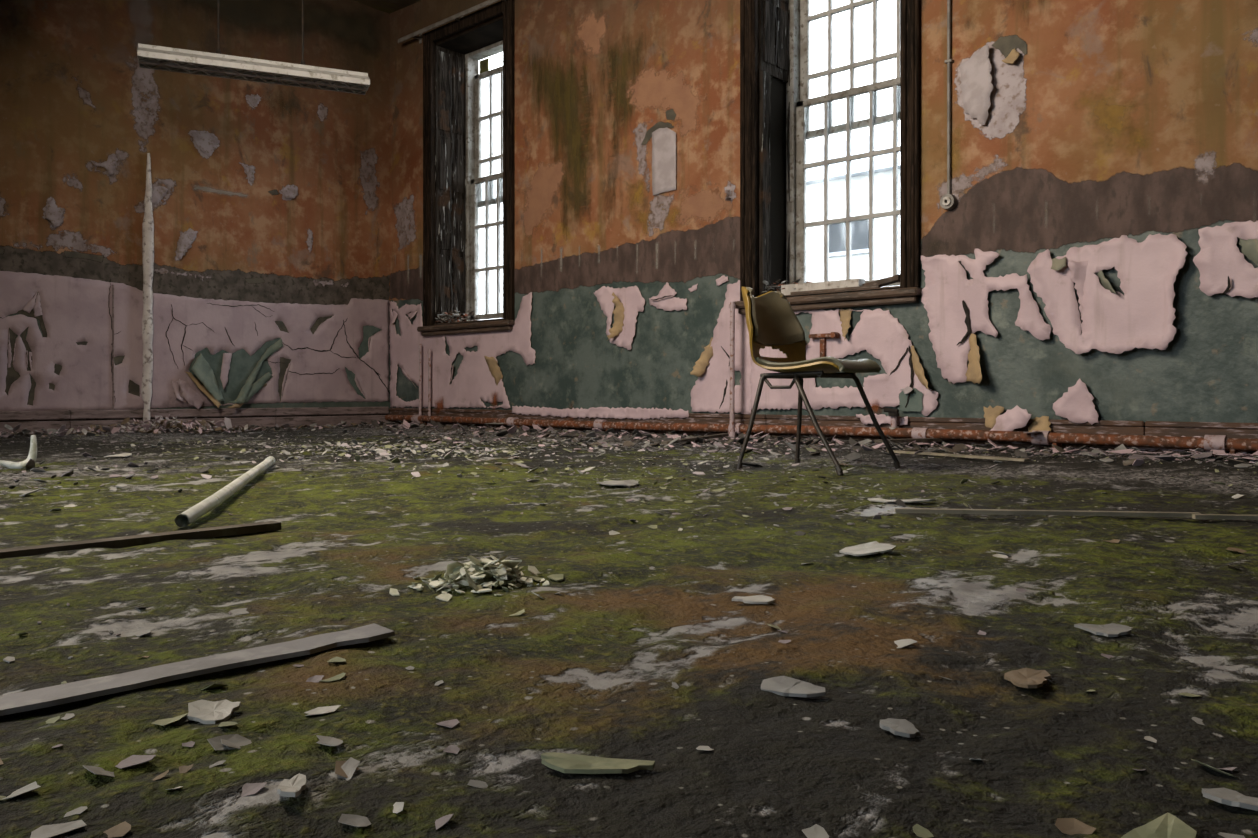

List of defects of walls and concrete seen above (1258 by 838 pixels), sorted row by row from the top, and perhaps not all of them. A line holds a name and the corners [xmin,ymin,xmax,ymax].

water stain [534,64,590,217]
water stain [609,42,640,149]
peeling [954,35,1027,140]
spalling [0,57,1258,433]
crack [166,303,390,394]